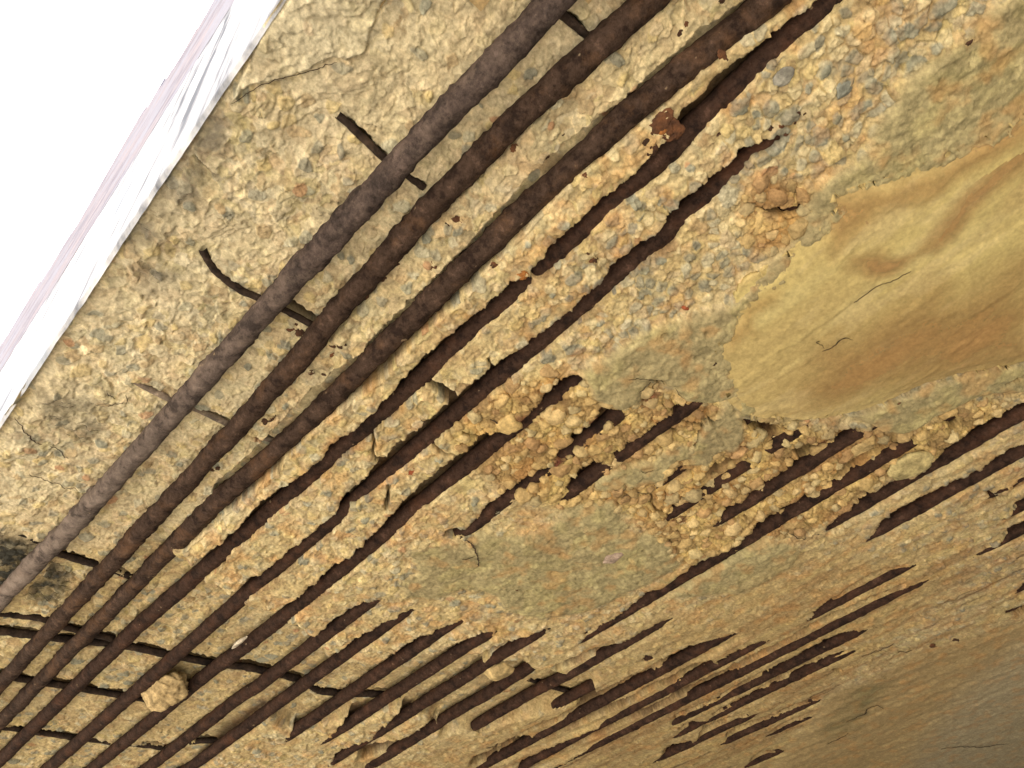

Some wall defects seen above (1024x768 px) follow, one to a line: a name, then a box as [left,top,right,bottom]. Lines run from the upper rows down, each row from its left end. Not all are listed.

spalling [0,0,532,580]
spalling [101,0,1005,682]
rust [642,108,686,156]
spalling [957,392,1024,410]
spalling [0,645,162,768]
spalling [103,421,1024,768]